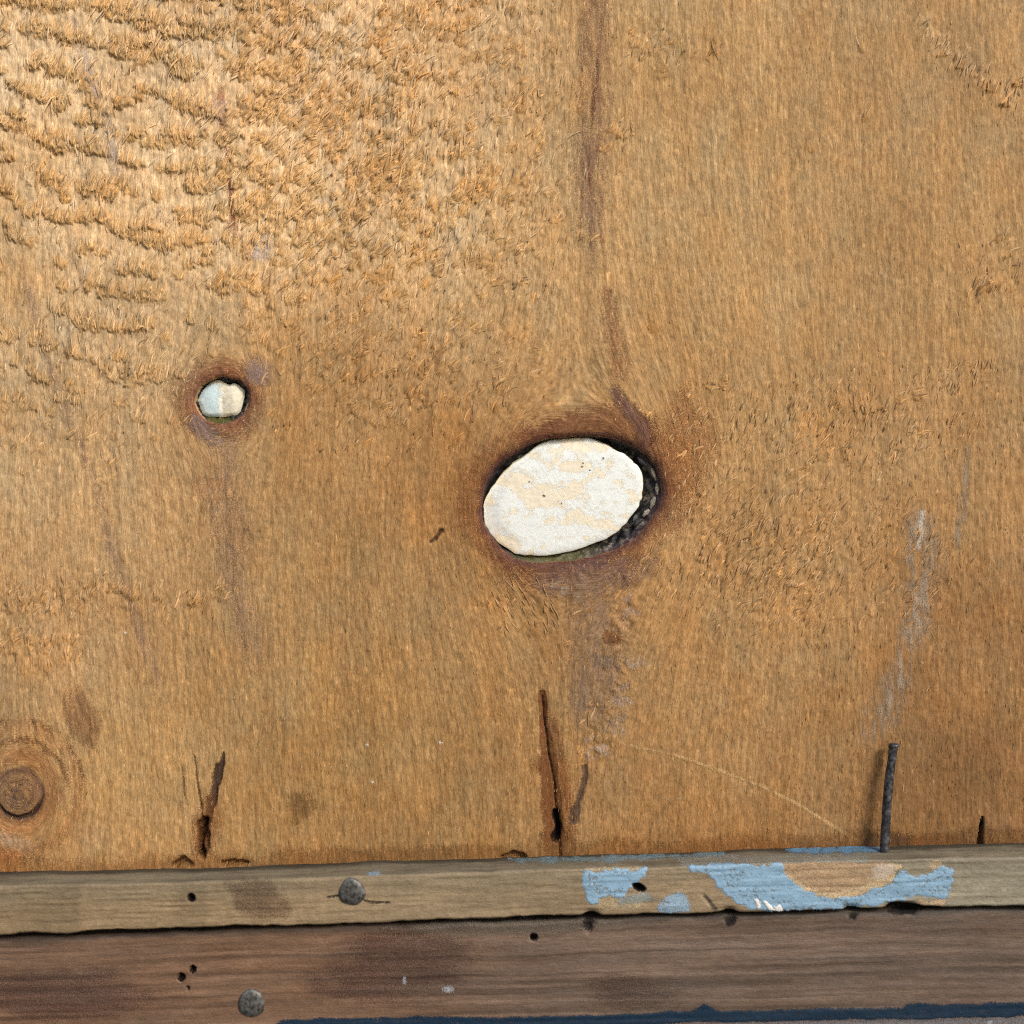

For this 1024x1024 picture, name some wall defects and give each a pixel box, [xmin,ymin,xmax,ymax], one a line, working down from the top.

peeling [754,899,782,912]